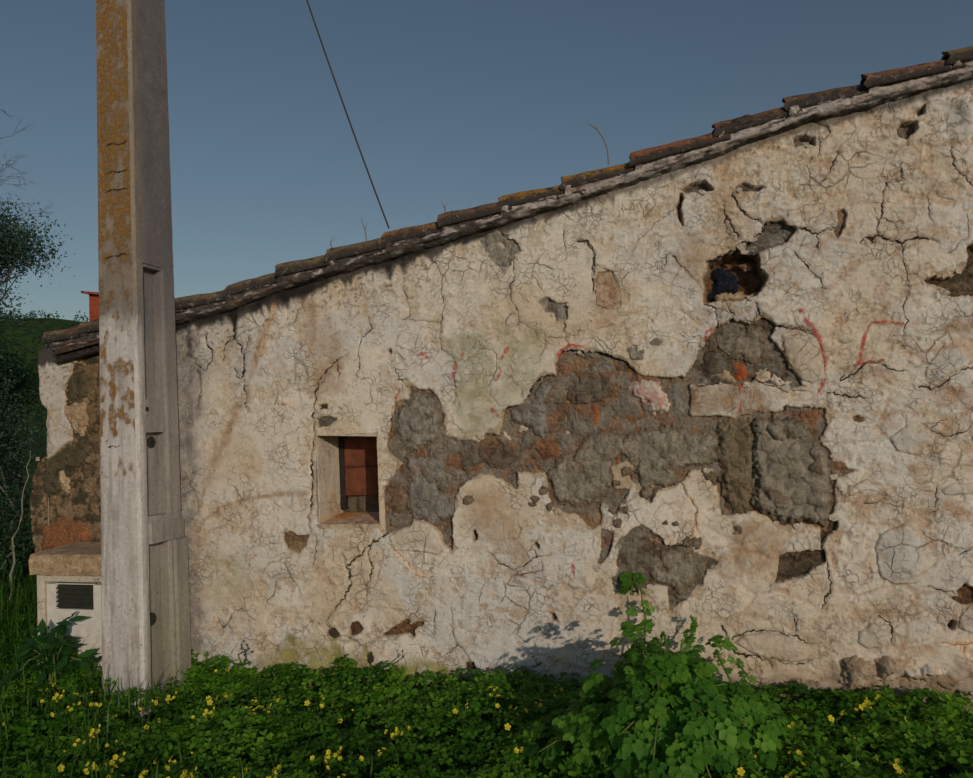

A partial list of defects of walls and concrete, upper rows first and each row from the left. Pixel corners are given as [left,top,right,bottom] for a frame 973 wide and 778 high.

crack [191,306,300,413]
crack [479,256,637,409]
spalling [705,223,795,305]
crack [664,168,973,399]
spalling [924,246,973,297]
spalling [29,353,101,553]
crack [217,317,372,632]
spalling [384,319,854,610]
spalling [284,528,309,554]
crack [327,533,429,652]
crack [721,616,819,666]
spalling [951,584,973,605]